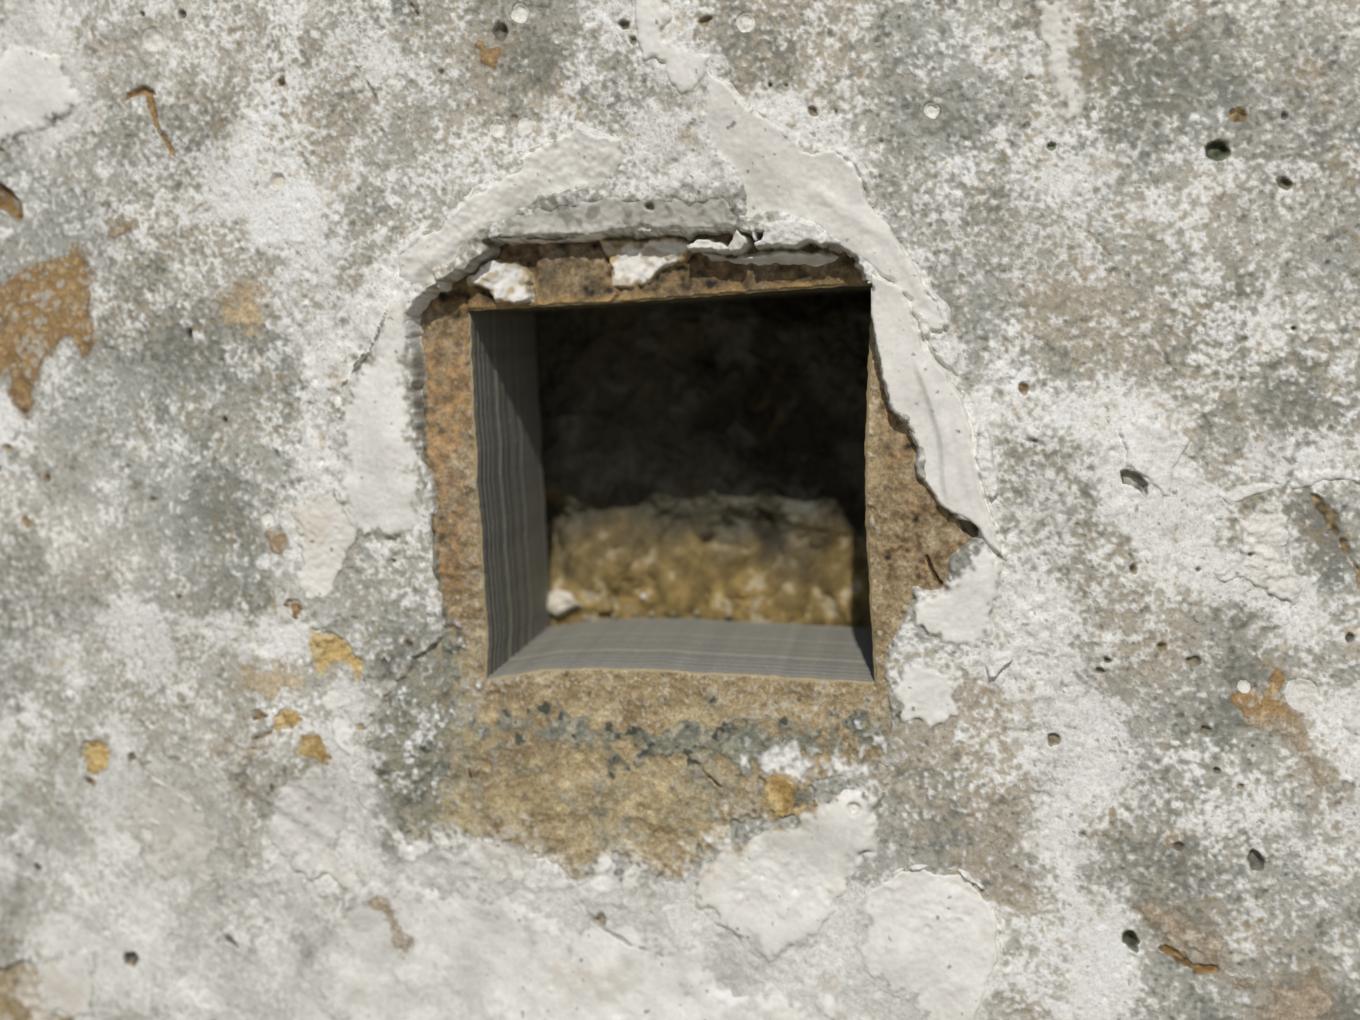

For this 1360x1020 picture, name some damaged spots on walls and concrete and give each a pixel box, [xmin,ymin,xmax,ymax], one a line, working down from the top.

crack [121,85,176,158]
spalling [0,182,24,222]
spalling [0,243,97,419]
spalling [283,70,1009,926]
spalling [81,740,111,787]
spalling [0,960,74,1020]